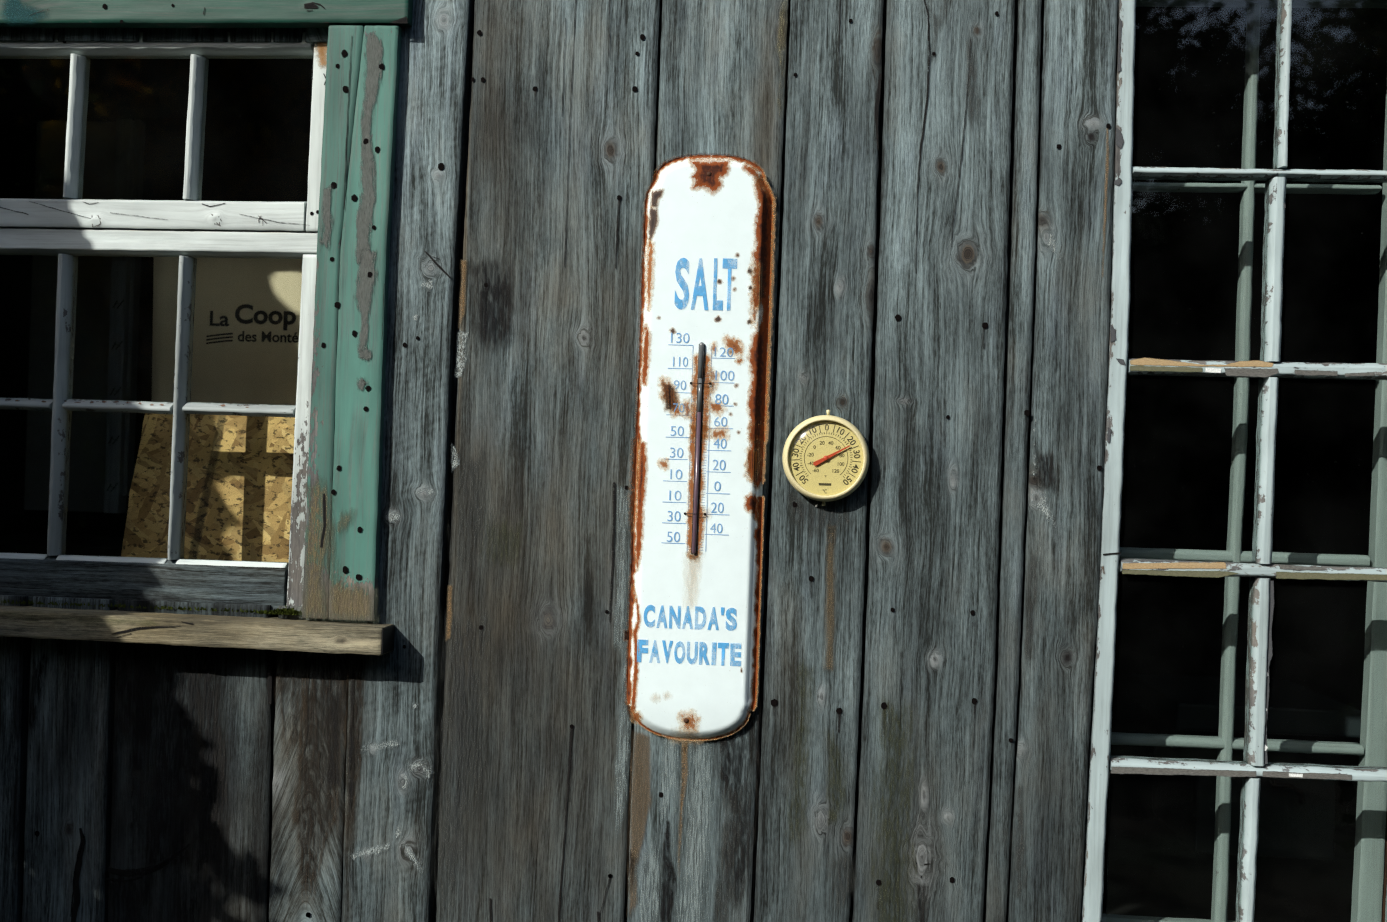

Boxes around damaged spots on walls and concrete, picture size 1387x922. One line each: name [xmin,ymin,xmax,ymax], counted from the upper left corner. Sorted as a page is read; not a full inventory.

peeling [1115,128,1124,149]
peeling [319,186,333,247]
peeling [355,31,383,361]
peeling [1110,325,1374,377]
rust [624,154,773,866]
peeling [1122,562,1238,578]
peeling [1111,565,1387,780]